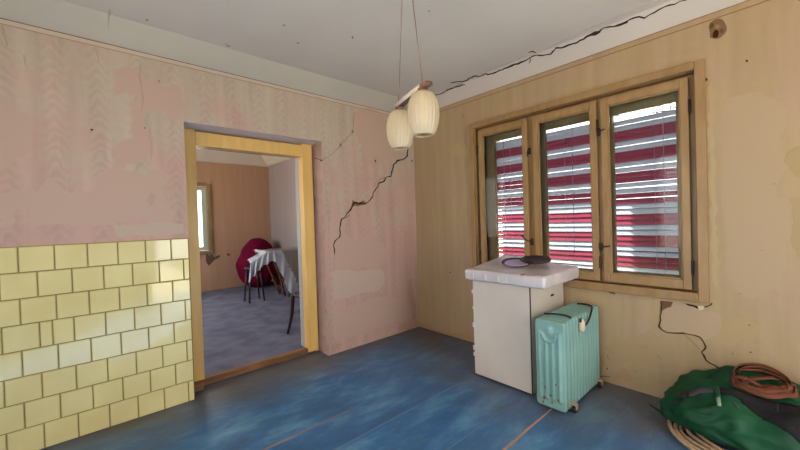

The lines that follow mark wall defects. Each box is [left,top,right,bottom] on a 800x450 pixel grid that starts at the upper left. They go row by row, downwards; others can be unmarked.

crack [435,0,686,95]
crack [333,137,414,260]
crack [658,301,719,368]